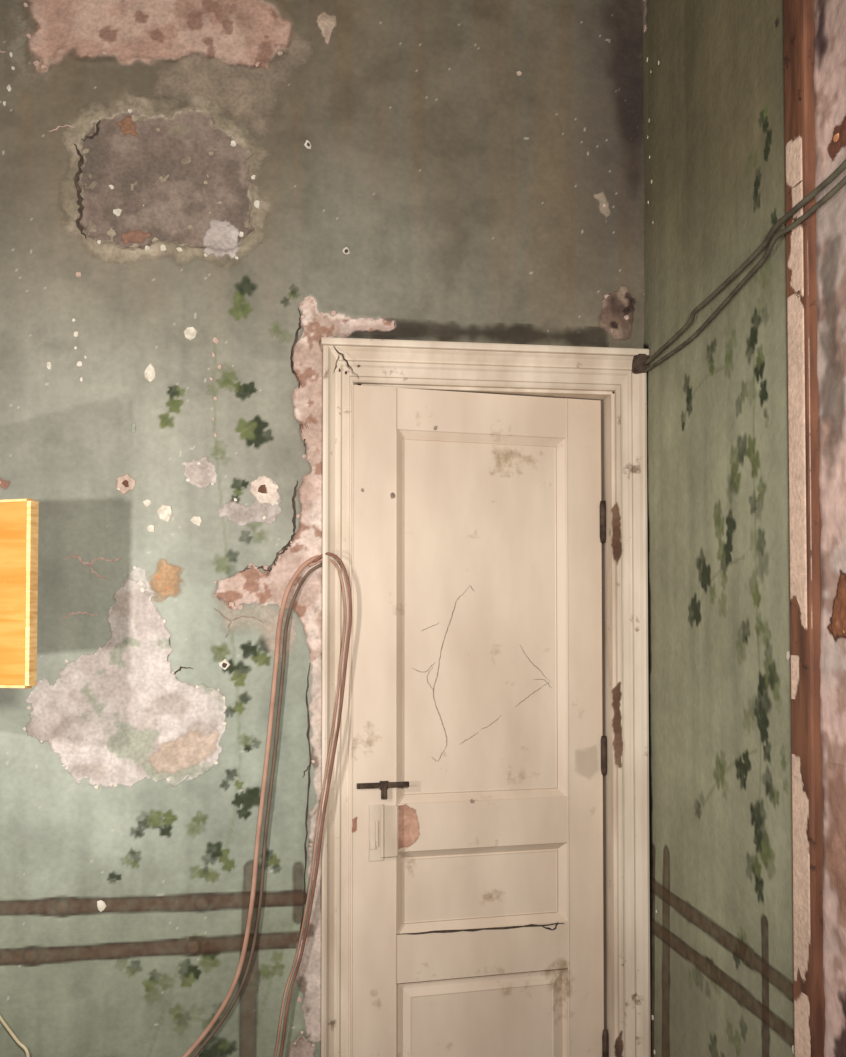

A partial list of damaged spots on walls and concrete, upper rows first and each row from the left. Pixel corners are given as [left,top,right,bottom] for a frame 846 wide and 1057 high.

flaking render [24,0,291,73]
flaking render [74,109,260,259]
flaking render [828,116,846,161]
flaking render [599,286,635,340]
peeling [786,136,812,629]
peeling [23,566,227,790]
flaking render [214,296,396,1057]
peeling [786,651,799,699]
flaking render [827,570,846,641]
peeling [792,754,811,1057]